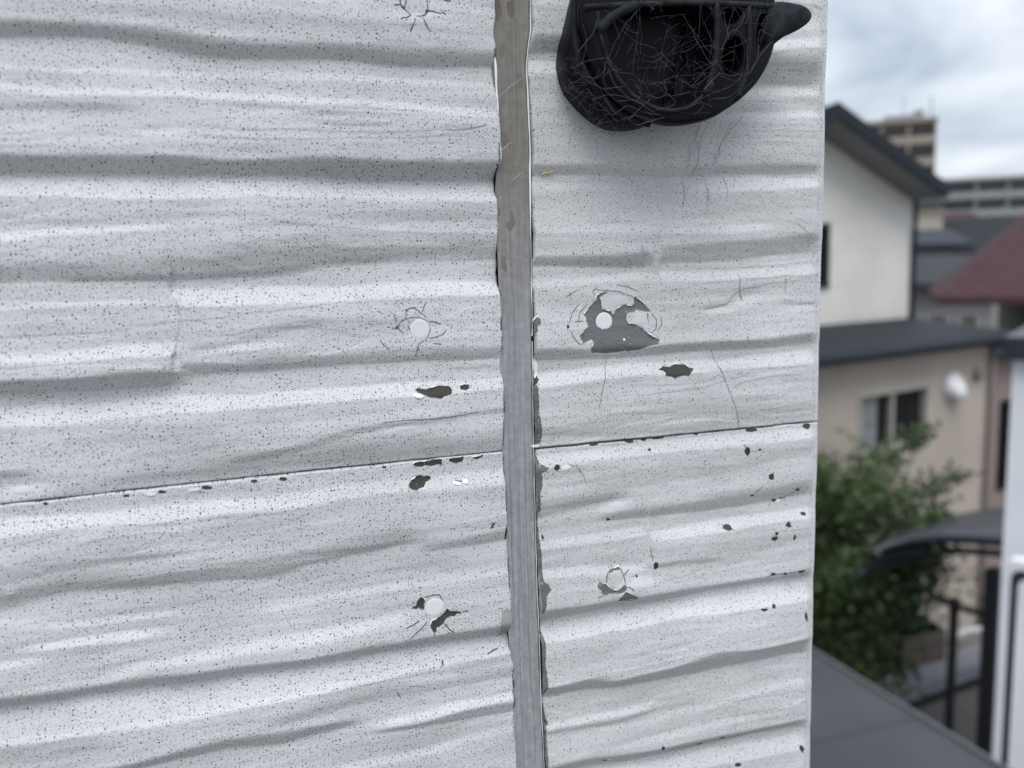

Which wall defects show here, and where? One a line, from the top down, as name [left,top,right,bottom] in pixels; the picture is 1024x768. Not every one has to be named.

crack [394,0,451,32]
crack [380,302,447,355]
peeling [580,292,659,353]
peeling [659,364,693,378]
peeling [413,384,470,399]
peeling [409,455,483,490]
peeling [598,567,638,601]
peeling [431,608,462,633]